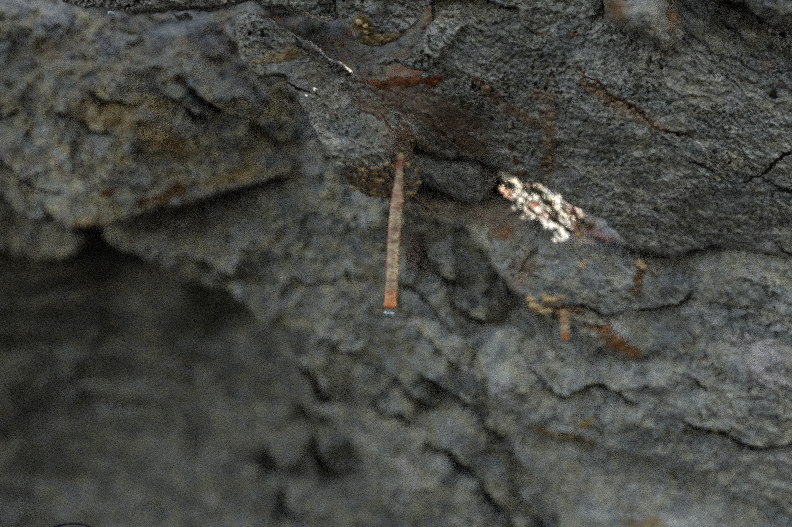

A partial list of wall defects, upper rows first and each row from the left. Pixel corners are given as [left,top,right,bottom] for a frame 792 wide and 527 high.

rust [359,72,444,90]
crack [691,150,792,193]
rust [539,298,583,320]